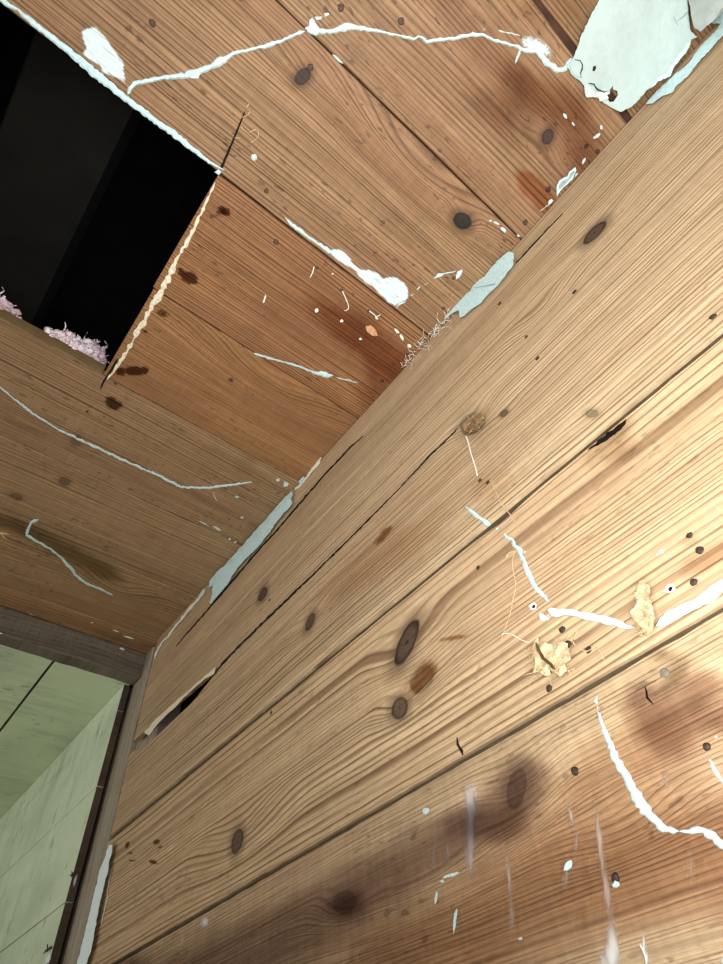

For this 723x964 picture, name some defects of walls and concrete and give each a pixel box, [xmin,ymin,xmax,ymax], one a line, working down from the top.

peeling [646,13,723,104]
peeling [444,252,514,320]
crack [0,387,252,501]
crack [0,519,113,596]
peeling [198,491,293,604]
damp [467,793,475,869]
damp [596,820,610,907]
damp [602,925,619,964]